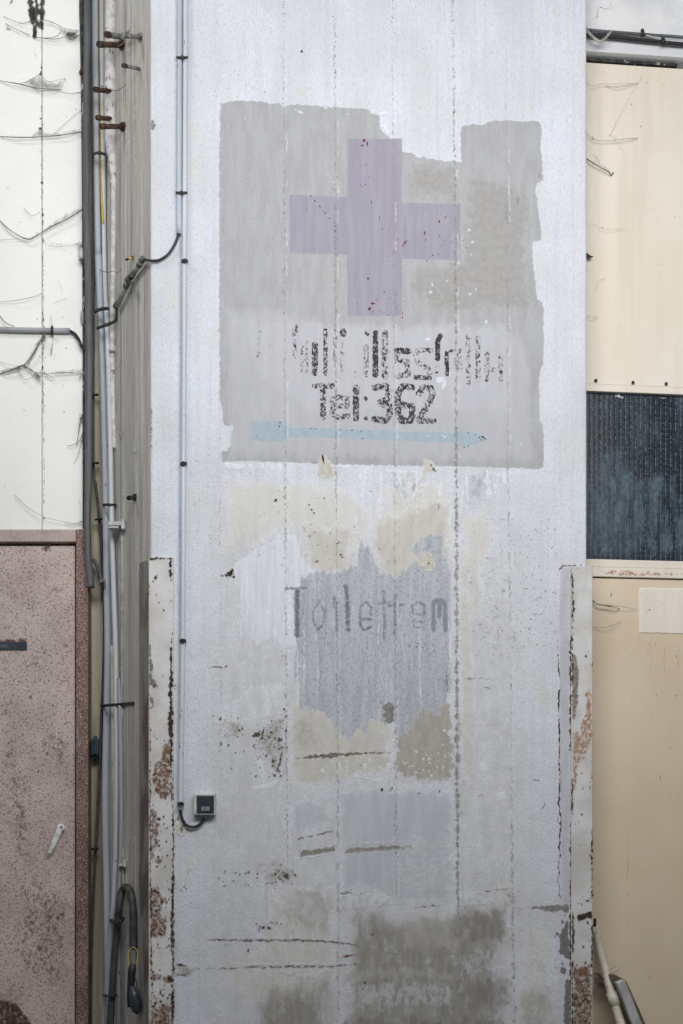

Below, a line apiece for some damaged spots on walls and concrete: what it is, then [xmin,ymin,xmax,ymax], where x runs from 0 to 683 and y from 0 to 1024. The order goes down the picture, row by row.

peeling [204,16,550,500]
flaking render [302,504,355,574]
flaking render [374,501,463,580]
rust [148,632,177,1024]
flaking render [285,702,472,918]
rust [569,569,594,1024]